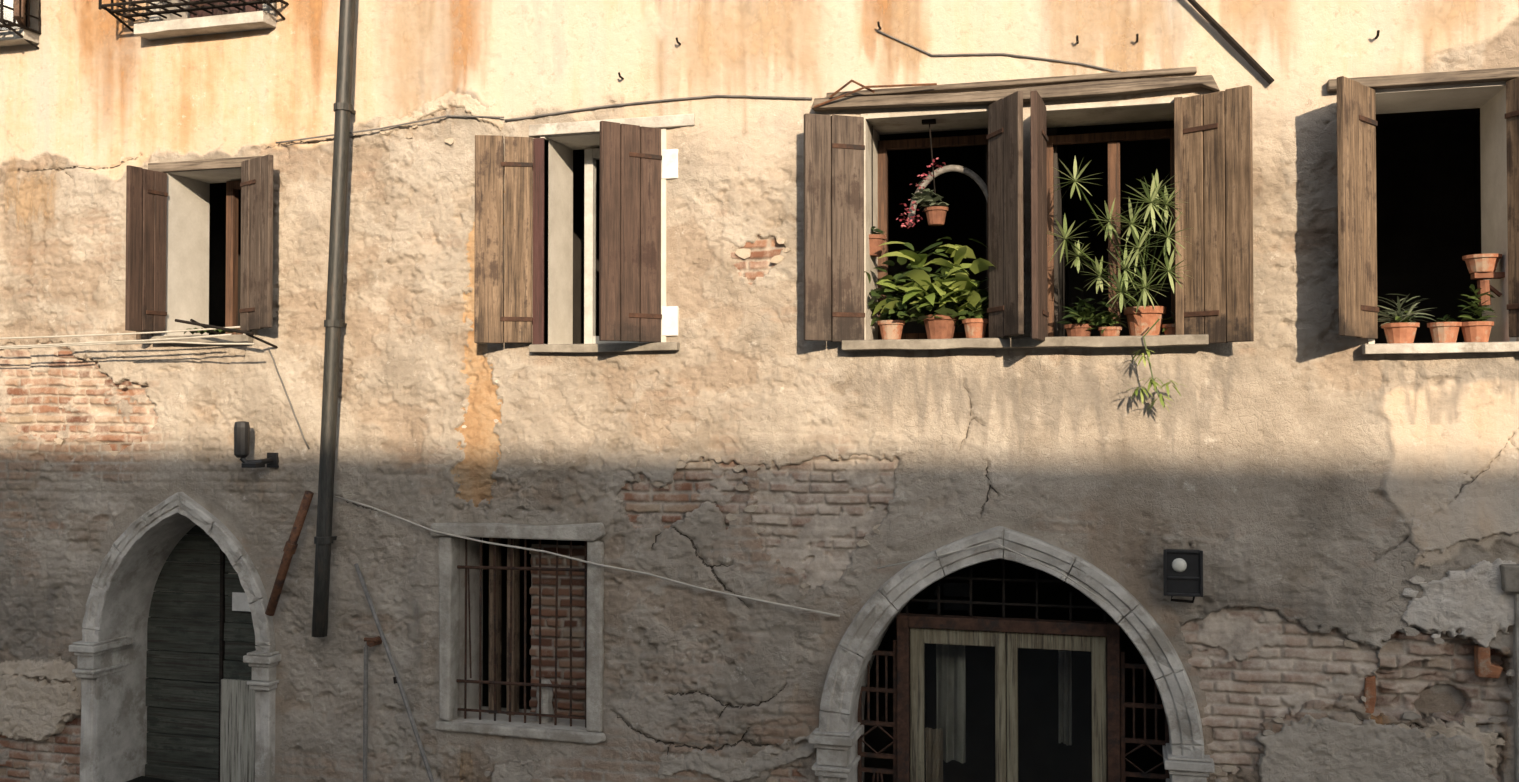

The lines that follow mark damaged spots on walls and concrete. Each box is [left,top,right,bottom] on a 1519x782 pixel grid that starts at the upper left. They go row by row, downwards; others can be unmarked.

spalling [0,342,159,457]
peeling [450,221,503,508]
crack [959,384,998,511]
spalling [618,454,899,592]
spalling [0,717,81,782]
spalling [1181,606,1515,782]